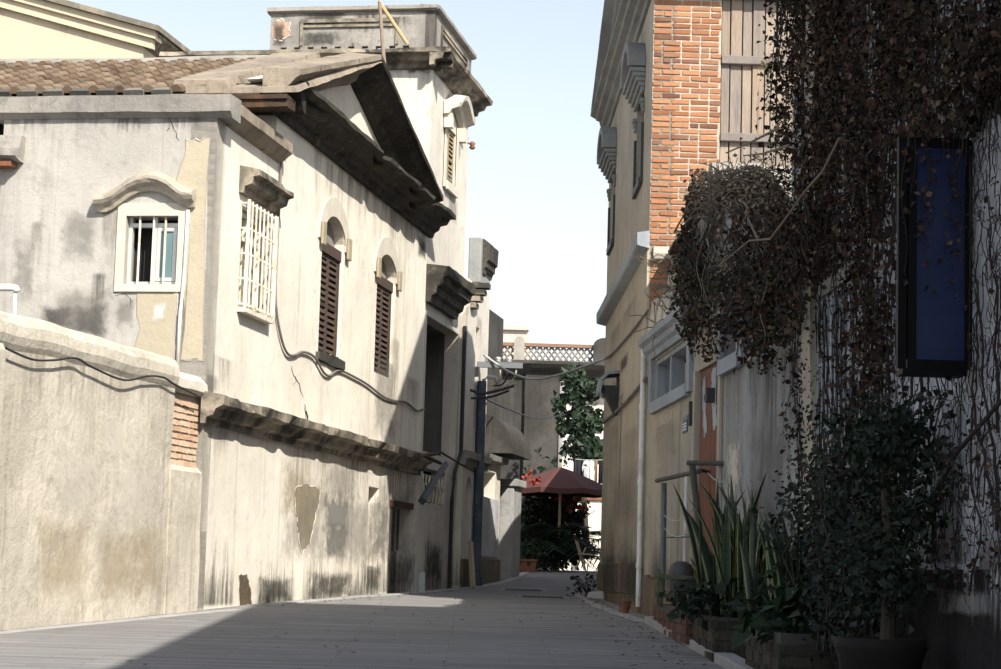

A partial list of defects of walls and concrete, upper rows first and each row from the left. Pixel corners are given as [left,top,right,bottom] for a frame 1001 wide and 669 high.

spalling [271,18,291,41]
water stain [46,307,102,335]
peeling [294,482,348,555]
water stain [209,569,231,604]
spalling [238,572,252,606]
water stain [263,579,288,602]